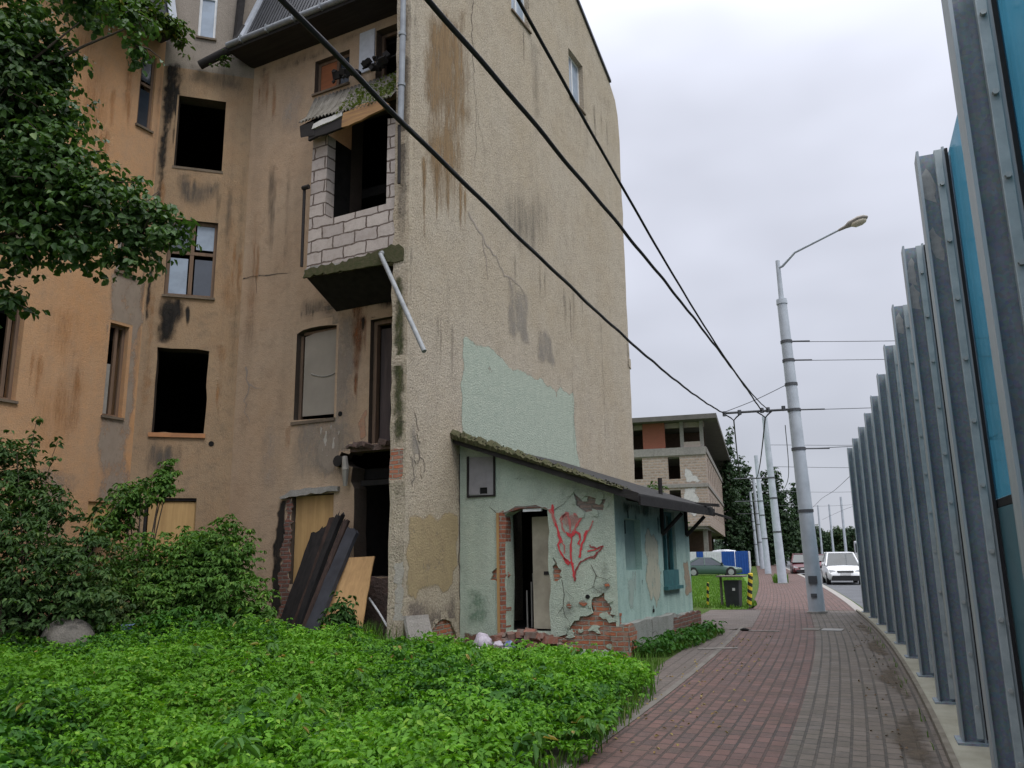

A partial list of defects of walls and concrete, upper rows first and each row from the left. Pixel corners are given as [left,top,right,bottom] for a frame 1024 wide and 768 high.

damp [422,15,467,222]
crack [468,211,524,306]
damp [162,300,190,337]
spalling [564,487,609,518]
crack [558,565,611,621]
spalling [558,583,638,657]